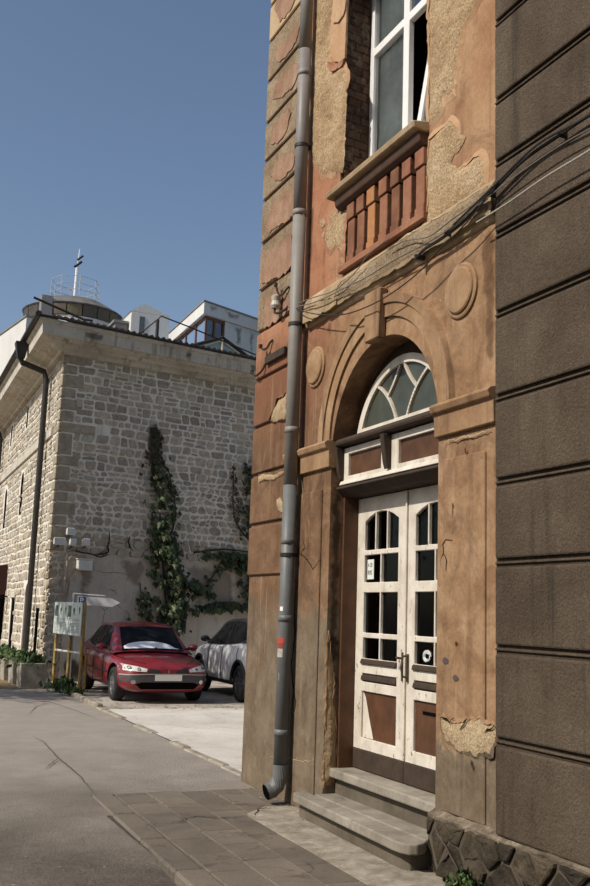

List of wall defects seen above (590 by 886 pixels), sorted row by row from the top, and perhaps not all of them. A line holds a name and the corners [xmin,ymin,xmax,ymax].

peeling [270,109,291,144]
peeling [271,151,295,181]
spalling [303,0,492,324]
peeling [266,185,294,234]
peeling [261,234,292,329]
spalling [440,713,497,759]
crack [35,737,92,791]